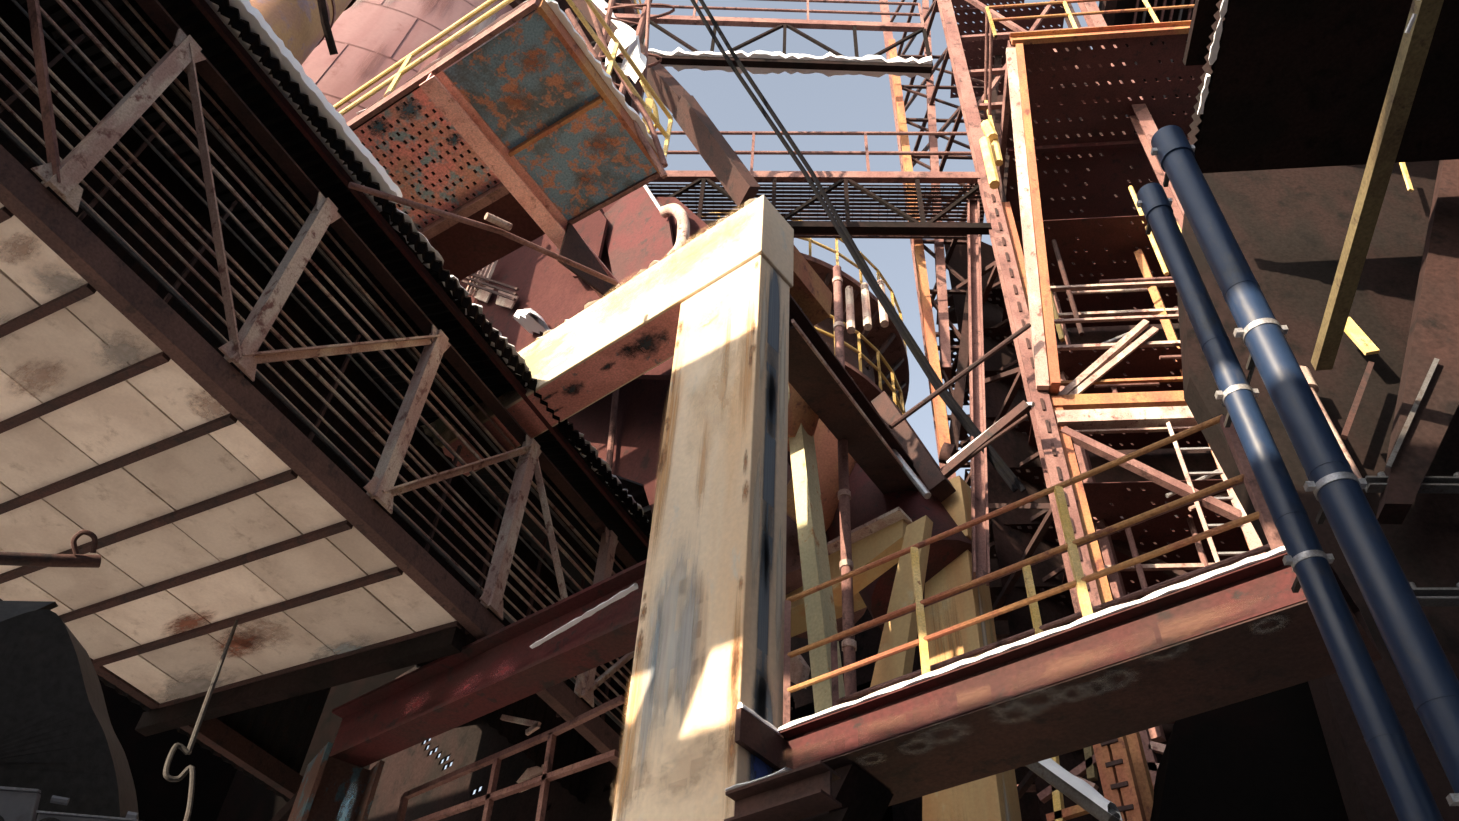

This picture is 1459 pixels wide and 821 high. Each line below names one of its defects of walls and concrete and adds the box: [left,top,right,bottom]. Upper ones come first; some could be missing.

leakage [640,558,697,763]